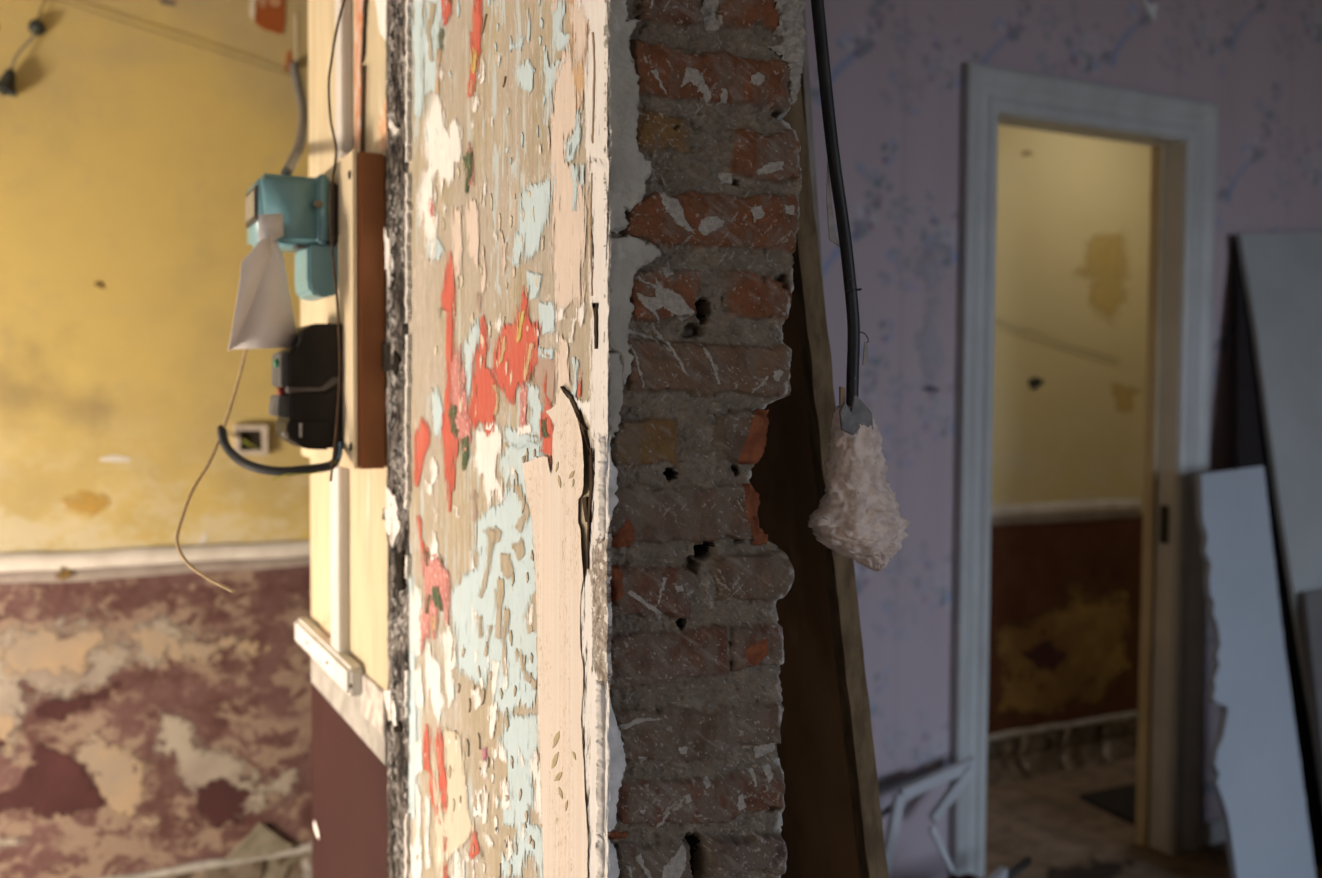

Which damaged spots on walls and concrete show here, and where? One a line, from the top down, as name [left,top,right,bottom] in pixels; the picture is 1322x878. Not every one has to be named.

peeling [416,67,462,265]
peeling [384,227,397,287]
peeling [384,455,439,561]
peeling [471,420,517,508]
crack [560,386,596,569]
peeling [574,397,592,425]
flaking render [590,0,802,878]
peeling [0,610,288,762]
peeling [72,706,299,826]
peeling [409,587,543,878]
peeling [986,581,1138,785]
flaking render [158,852,312,878]